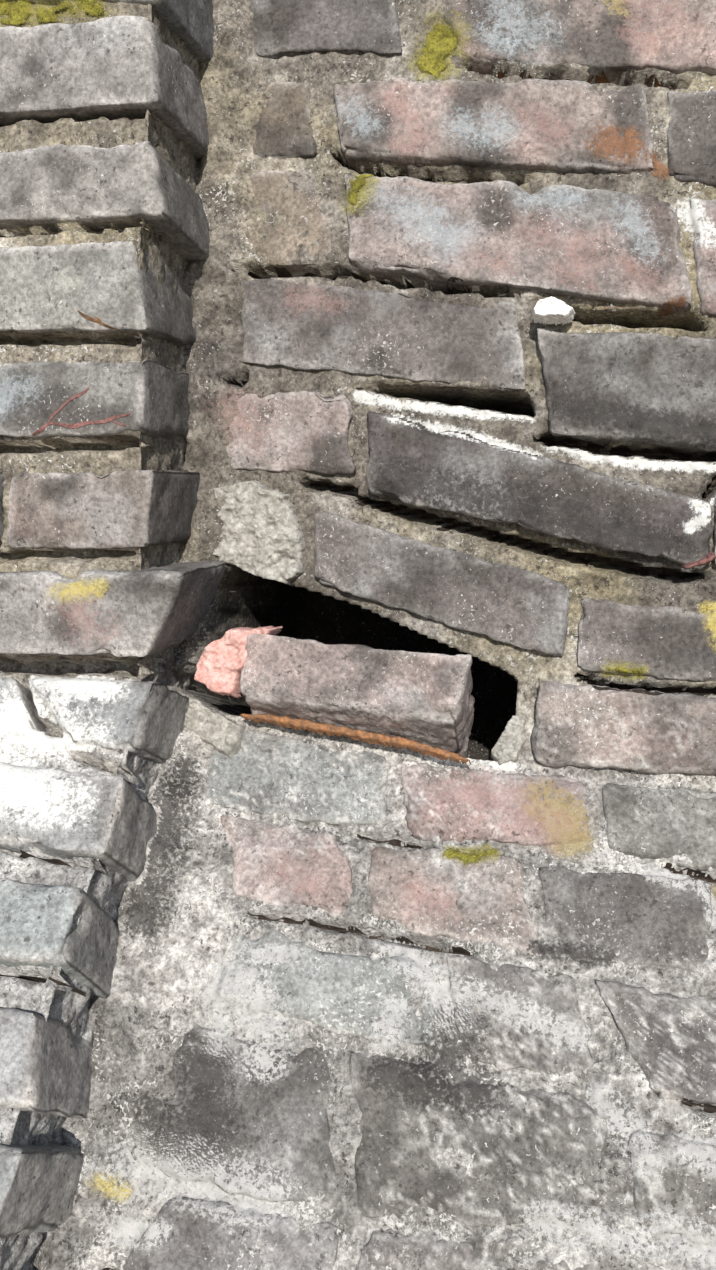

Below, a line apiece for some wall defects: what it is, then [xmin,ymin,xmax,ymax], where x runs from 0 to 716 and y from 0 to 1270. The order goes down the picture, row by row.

spalling [194,626,282,698]
spalling [239,713,471,765]